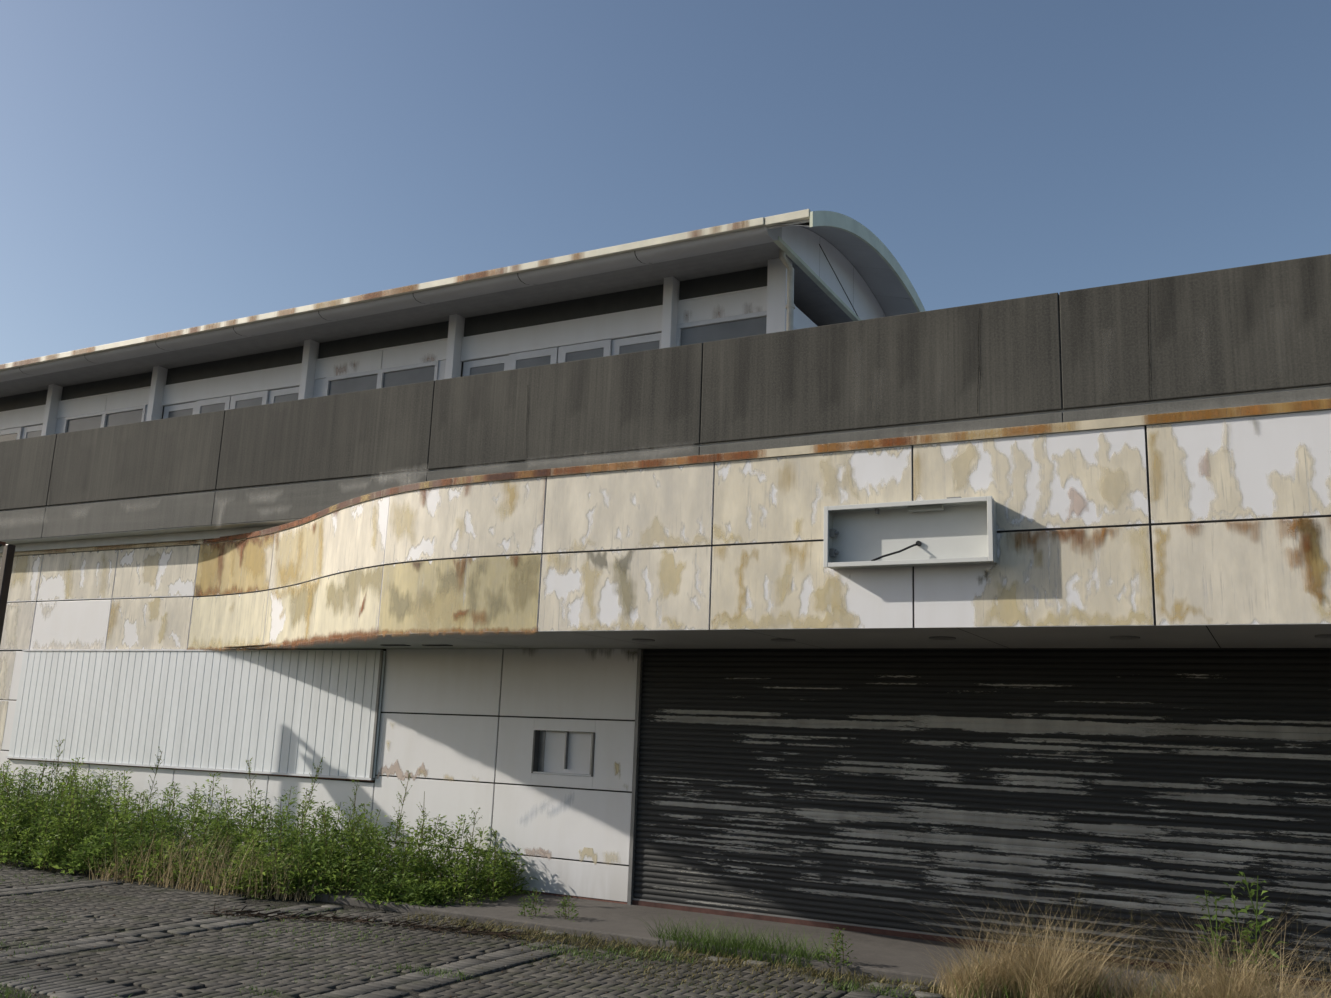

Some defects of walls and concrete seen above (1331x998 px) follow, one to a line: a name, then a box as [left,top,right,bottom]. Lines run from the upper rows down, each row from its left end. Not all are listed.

rust [358,284,416,301]
rust [153,315,256,340]
rust [0,355,55,369]
rust [196,450,759,596]
rust [1281,518,1327,601]
rust [187,611,536,651]
peeling [643,683,1331,964]